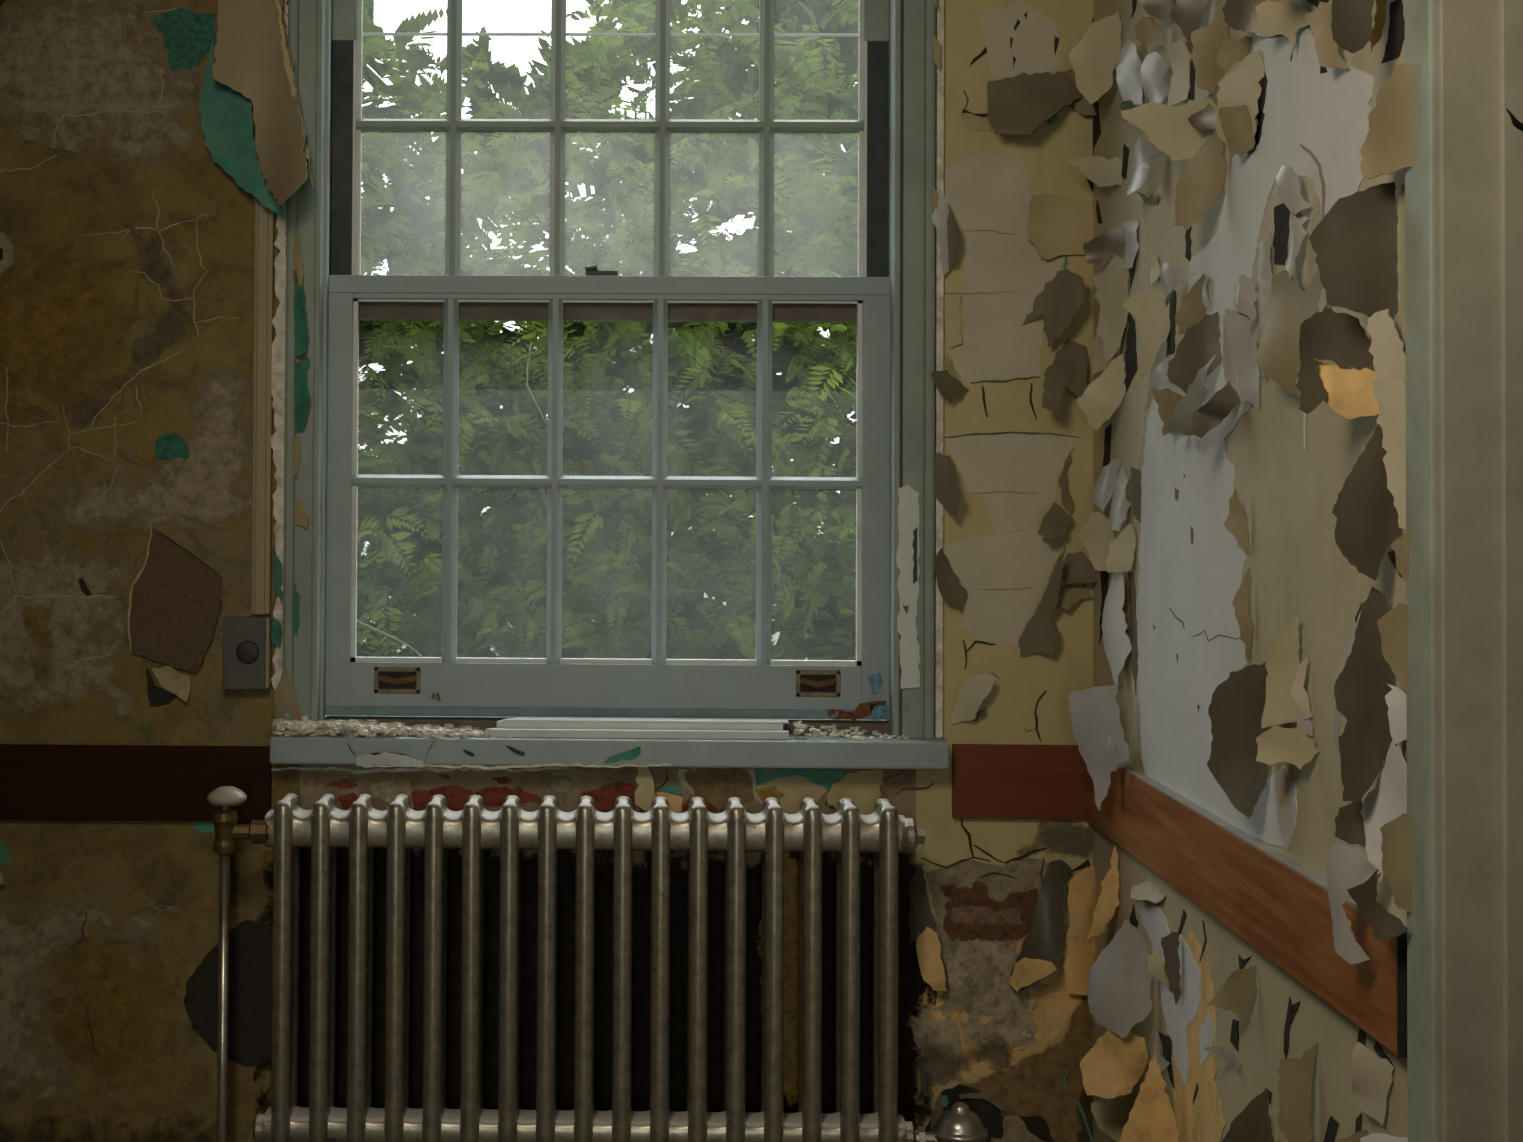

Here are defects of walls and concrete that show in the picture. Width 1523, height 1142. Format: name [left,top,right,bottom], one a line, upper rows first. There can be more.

crack [0,70,168,173]
leakage [0,0,202,169]
crack [0,190,242,615]
peeling [151,0,314,721]
peeling [896,0,1414,964]
spalling [78,528,223,707]
peeling [193,821,215,834]
peeling [272,740,934,815]
peeling [908,845,1408,1142]